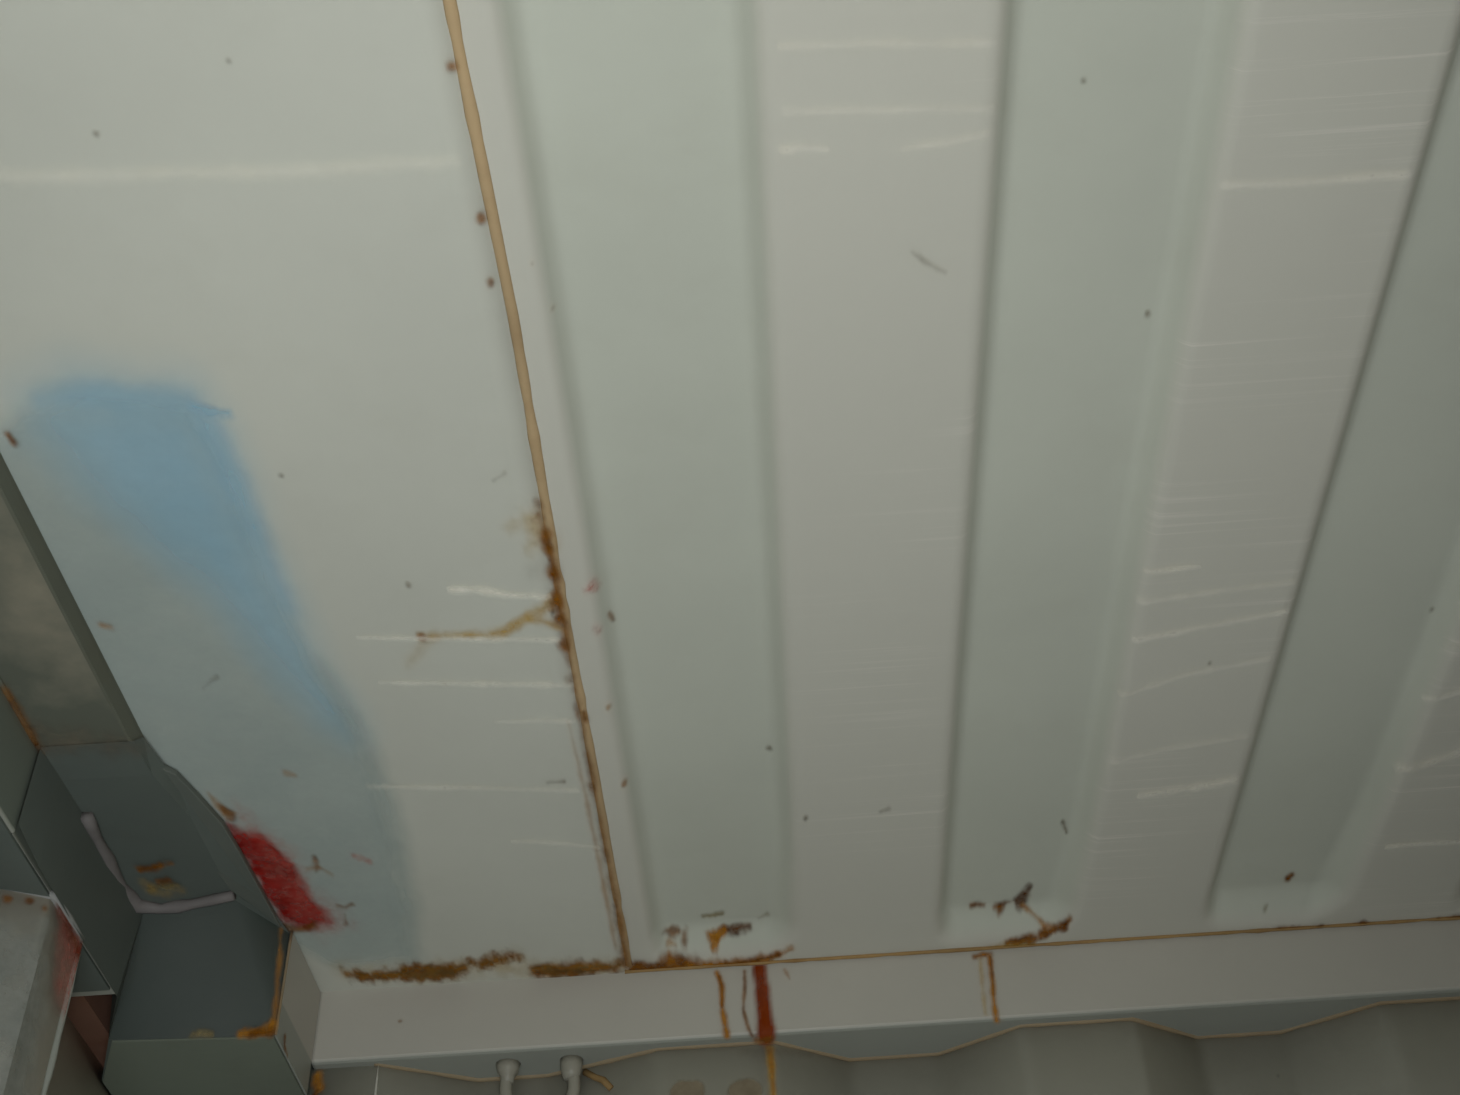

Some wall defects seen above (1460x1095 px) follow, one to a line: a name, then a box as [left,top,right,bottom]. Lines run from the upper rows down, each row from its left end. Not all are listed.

rust [543,532,568,650]
rust [970,886,1031,913]
rust [1005,918,1071,946]
rust [345,905,781,1095]
rust [973,953,998,1022]
rust [238,1020,288,1056]